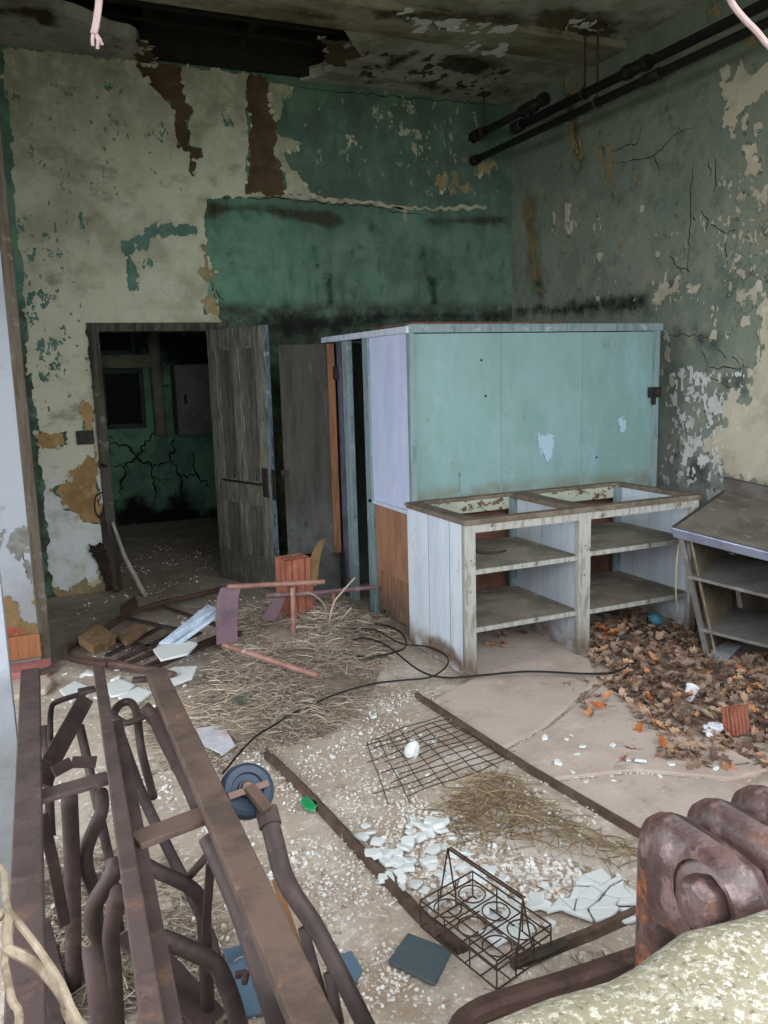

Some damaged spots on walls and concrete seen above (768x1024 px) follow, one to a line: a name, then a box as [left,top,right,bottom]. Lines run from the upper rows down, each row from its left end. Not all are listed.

water stain [373,8,622,38]
peeling [565,19,604,32]
peeling [372,7,518,197]
crack [614,127,692,171]
water stain [206,202,229,217]
water stain [257,206,341,227]
crack [670,159,735,276]
peeling [0,0,398,606]
water stain [263,314,408,336]
peeling [645,231,731,342]
peeling [659,28,768,501]
crack [110,433,209,499]